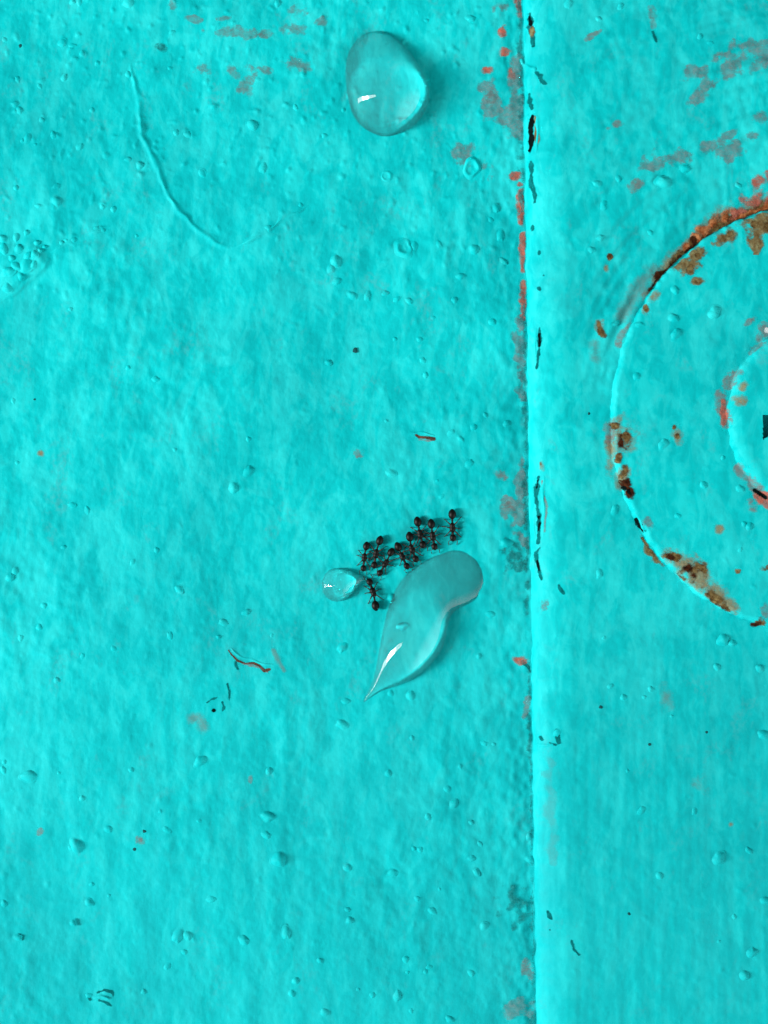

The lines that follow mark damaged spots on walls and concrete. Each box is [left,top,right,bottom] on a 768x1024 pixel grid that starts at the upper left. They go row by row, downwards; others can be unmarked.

crack [519,13,547,291]
rust [643,193,768,312]
rust [605,421,635,499]
crack [528,475,565,595]
rust [641,537,737,612]